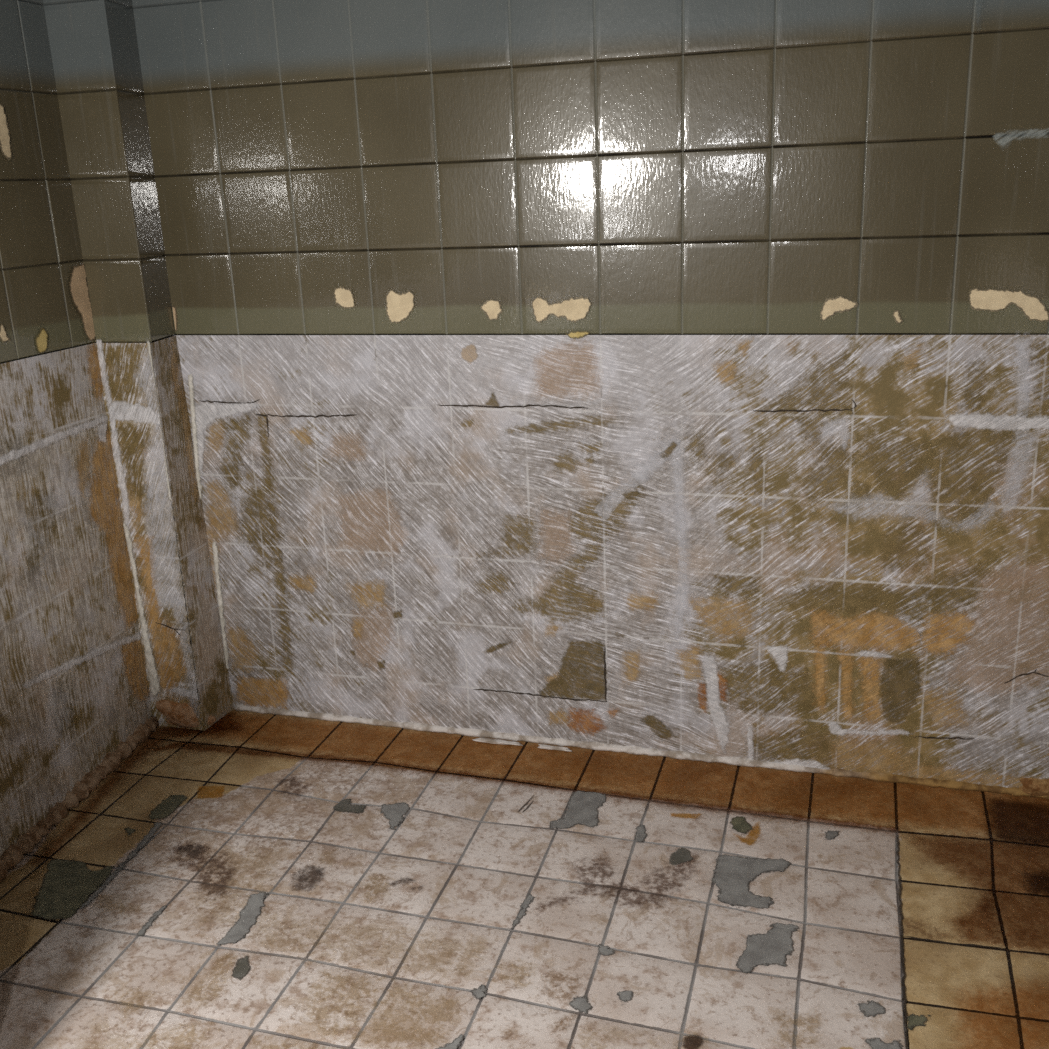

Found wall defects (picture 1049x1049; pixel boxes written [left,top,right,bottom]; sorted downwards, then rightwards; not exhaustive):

peeling [0,104,12,160]
peeling [70,264,142,401]
peeling [334,287,355,308]
peeling [386,290,414,323]
peeling [532,296,591,339]
peeling [820,296,858,321]
peeling [969,288,1049,322]
water stain [172,506,200,704]
water stain [212,542,229,669]
spalling [711,854,791,909]
water stain [938,801,1049,940]
spalling [736,923,798,973]